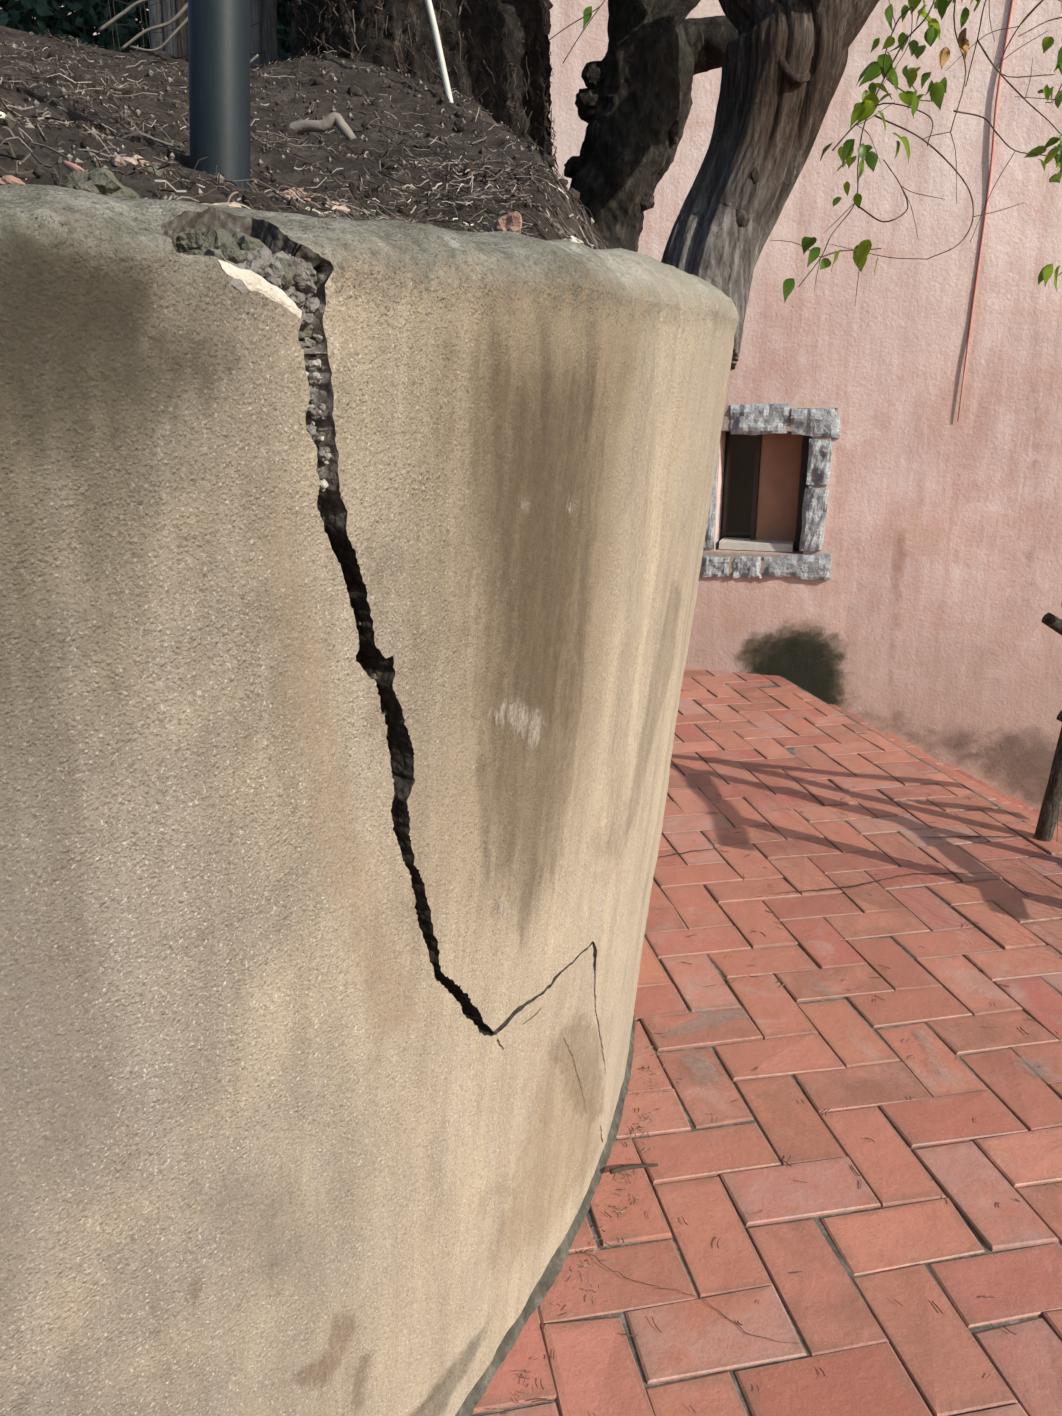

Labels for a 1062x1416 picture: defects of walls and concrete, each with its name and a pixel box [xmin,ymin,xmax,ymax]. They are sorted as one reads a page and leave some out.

spalling [161,207,341,437]
crack [299,334,606,1143]
leakage [738,625,845,706]